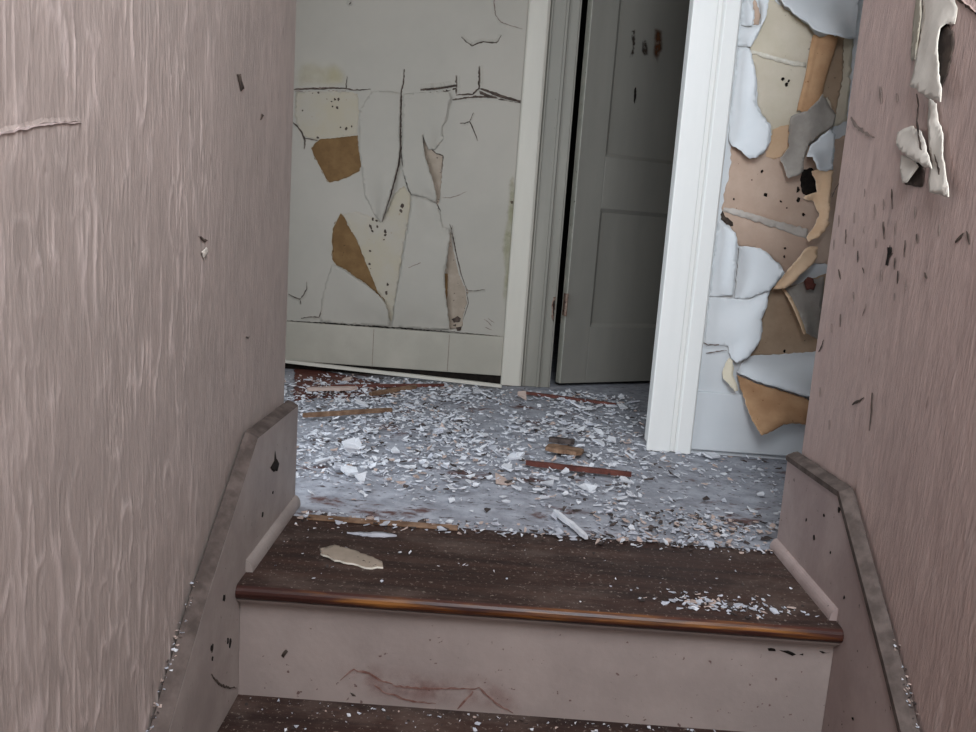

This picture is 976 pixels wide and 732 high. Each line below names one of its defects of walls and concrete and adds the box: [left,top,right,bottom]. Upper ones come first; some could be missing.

crack [293,123,318,149]
flaking render [295,91,361,183]
crack [294,77,371,93]
flaking render [423,137,444,211]
crack [382,0,522,222]
flaking render [722,0,854,356]
peeling [896,0,958,197]
flaking render [331,186,411,321]
crack [287,224,497,336]
flaking render [445,232,469,331]